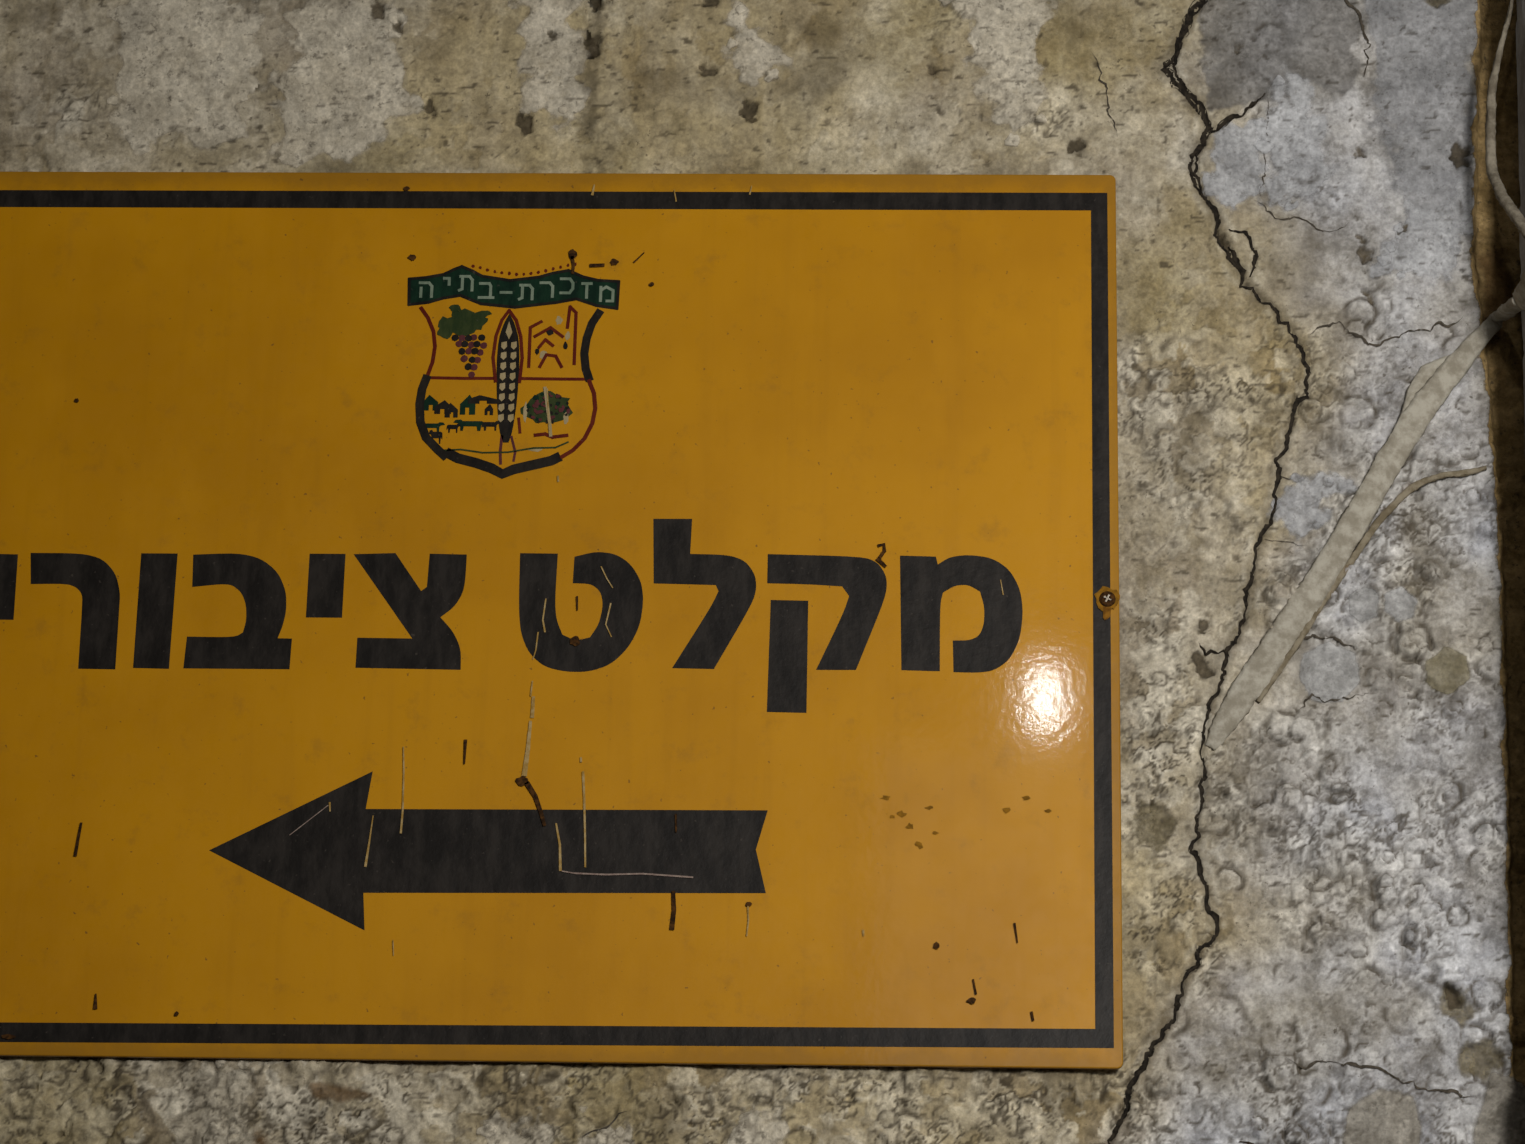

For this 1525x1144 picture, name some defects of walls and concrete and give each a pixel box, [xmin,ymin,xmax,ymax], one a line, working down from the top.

crack [1092,53,1118,136]
crack [1107,0,1470,1144]